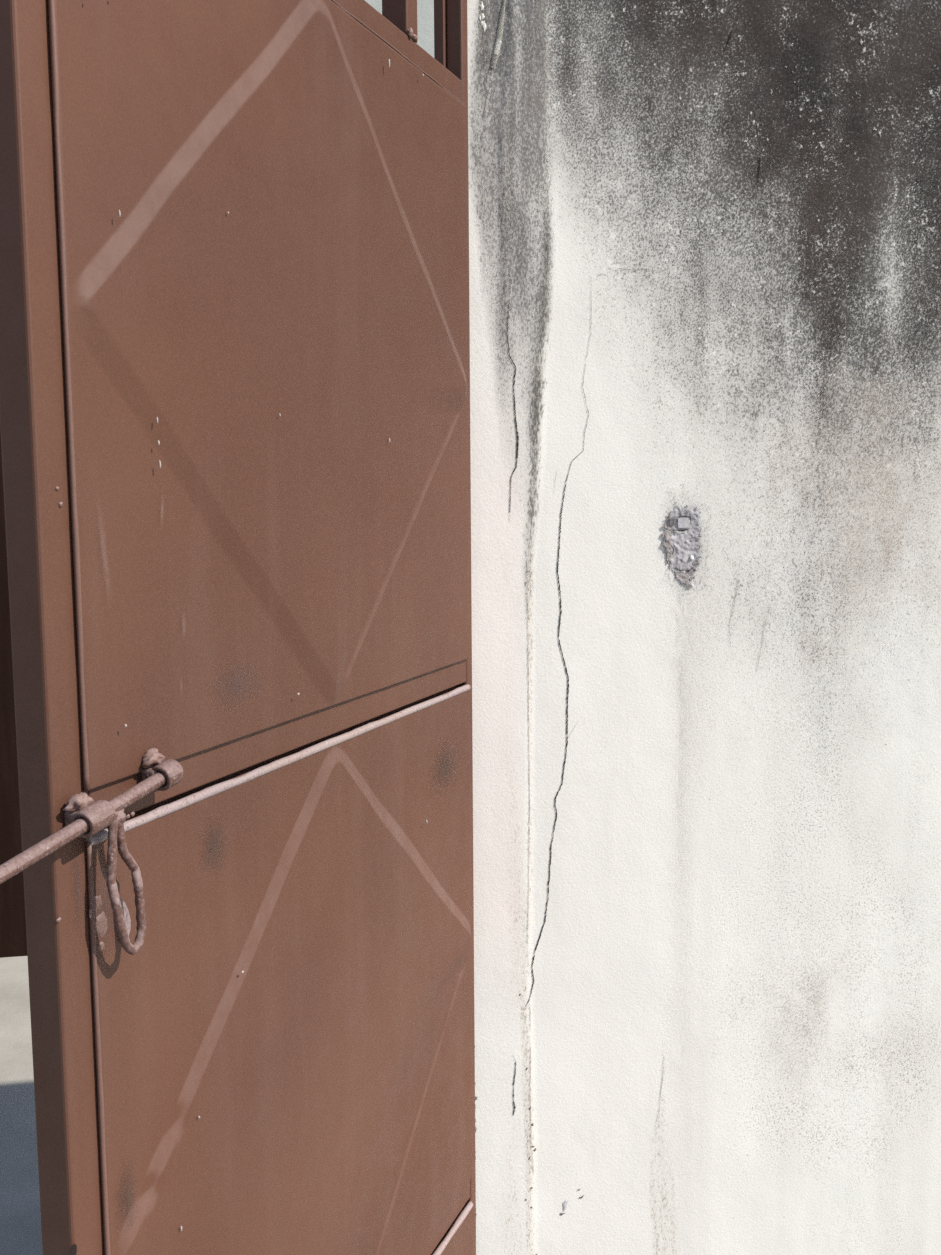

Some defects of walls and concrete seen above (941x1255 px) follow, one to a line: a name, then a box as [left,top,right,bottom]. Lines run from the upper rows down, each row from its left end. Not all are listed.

crack [507,277,519,522]
crack [512,269,668,1172]
spalling [662,494,708,595]
damp [471,0,941,620]